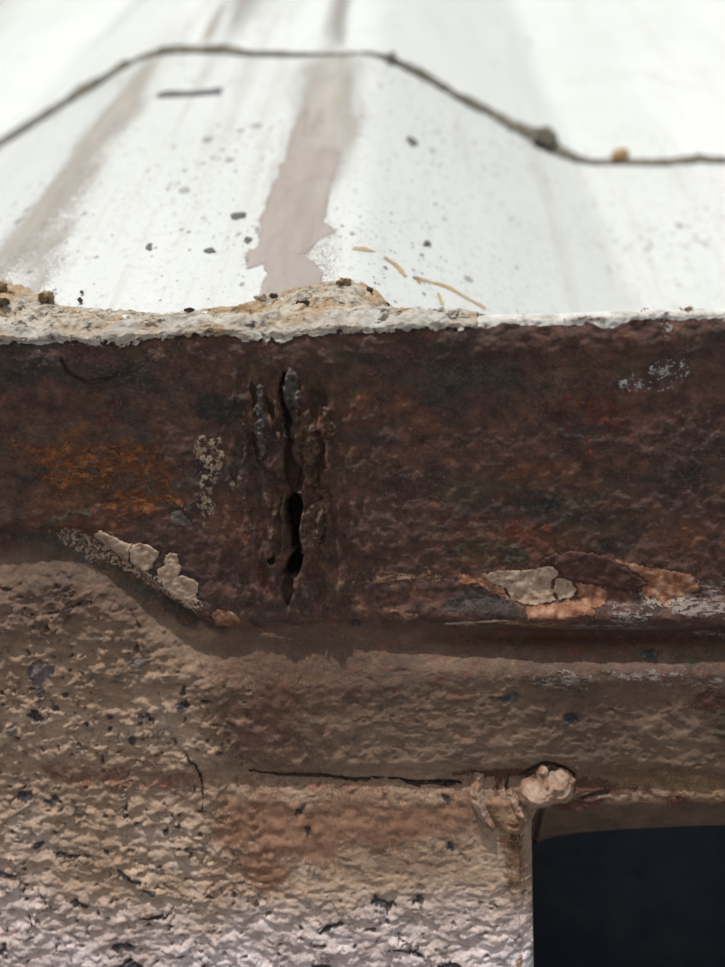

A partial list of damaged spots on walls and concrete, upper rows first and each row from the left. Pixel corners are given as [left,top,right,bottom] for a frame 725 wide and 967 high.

damp [0,0,304,293]
damp [244,0,382,295]
rust [7,392,184,521]
crack [241,367,335,605]
peeling [49,527,241,627]
rust [351,570,447,621]
peeling [457,559,725,640]
peeling [526,644,725,695]
crack [248,769,461,787]